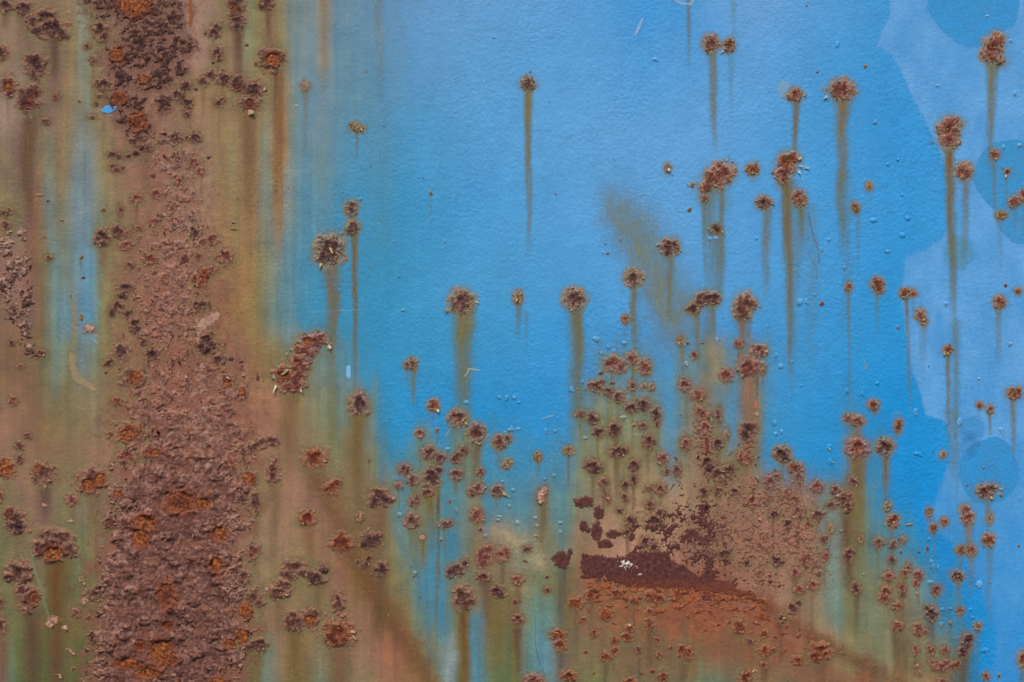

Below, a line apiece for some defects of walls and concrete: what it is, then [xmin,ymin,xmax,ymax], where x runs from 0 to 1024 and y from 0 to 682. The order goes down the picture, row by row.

rust [519,69,539,171]
rust [342,200,361,341]
rust [426,398,441,413]